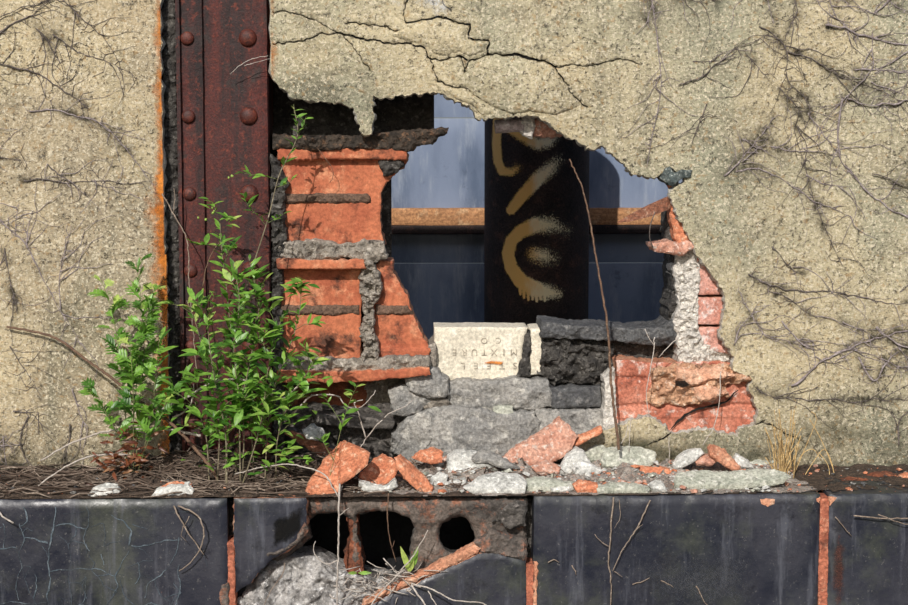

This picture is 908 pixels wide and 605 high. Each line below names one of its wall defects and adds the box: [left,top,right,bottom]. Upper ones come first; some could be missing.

crack [272,0,638,107]
rust [151,71,169,456]
spalling [268,54,758,436]
peeling [572,480,598,493]
flaking render [599,444,754,474]
crack [0,507,208,605]
spalling [219,582,230,605]
spalling [267,522,309,556]
spalling [362,542,481,605]